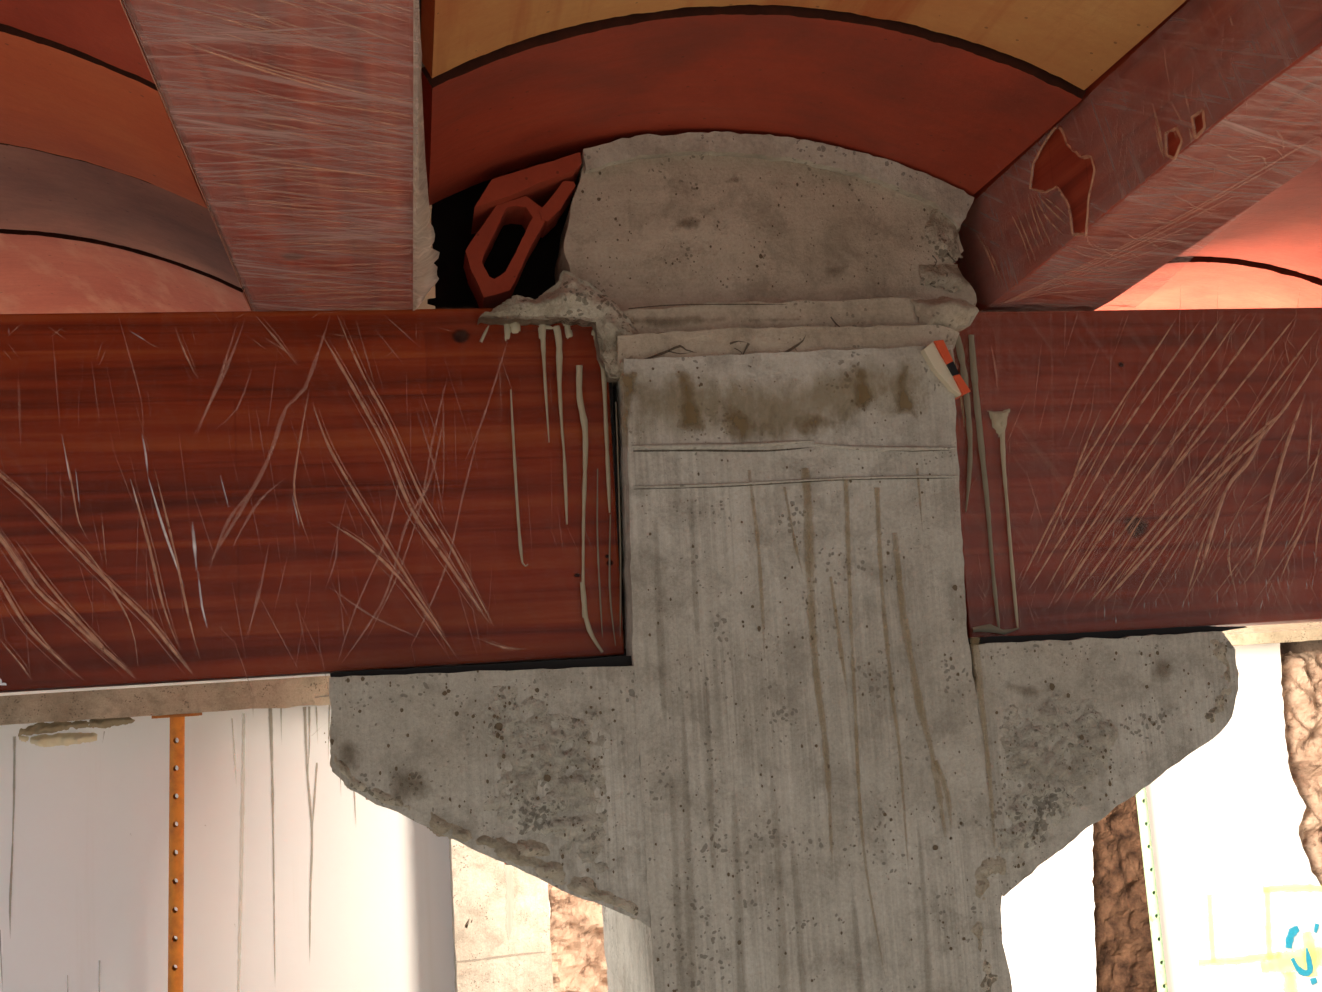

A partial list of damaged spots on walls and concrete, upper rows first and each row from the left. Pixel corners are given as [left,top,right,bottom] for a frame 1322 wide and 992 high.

water stain [653,369,913,440]
peeling [18,717,135,747]
spalling [330,749,411,811]
spalling [427,685,638,919]